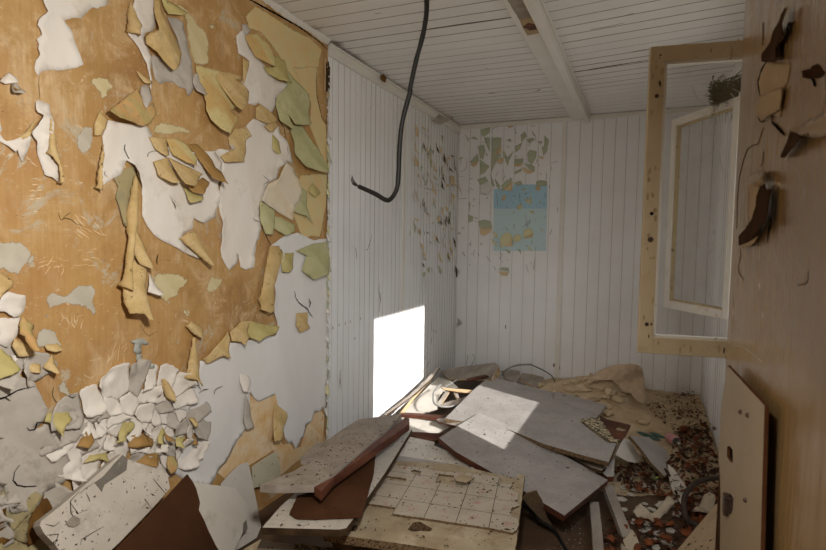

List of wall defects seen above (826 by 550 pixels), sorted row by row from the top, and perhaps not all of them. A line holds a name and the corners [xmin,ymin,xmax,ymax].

peeling [756,7,826,158]
peeling [410,124,549,278]
peeling [738,171,772,247]
peeling [0,338,212,550]